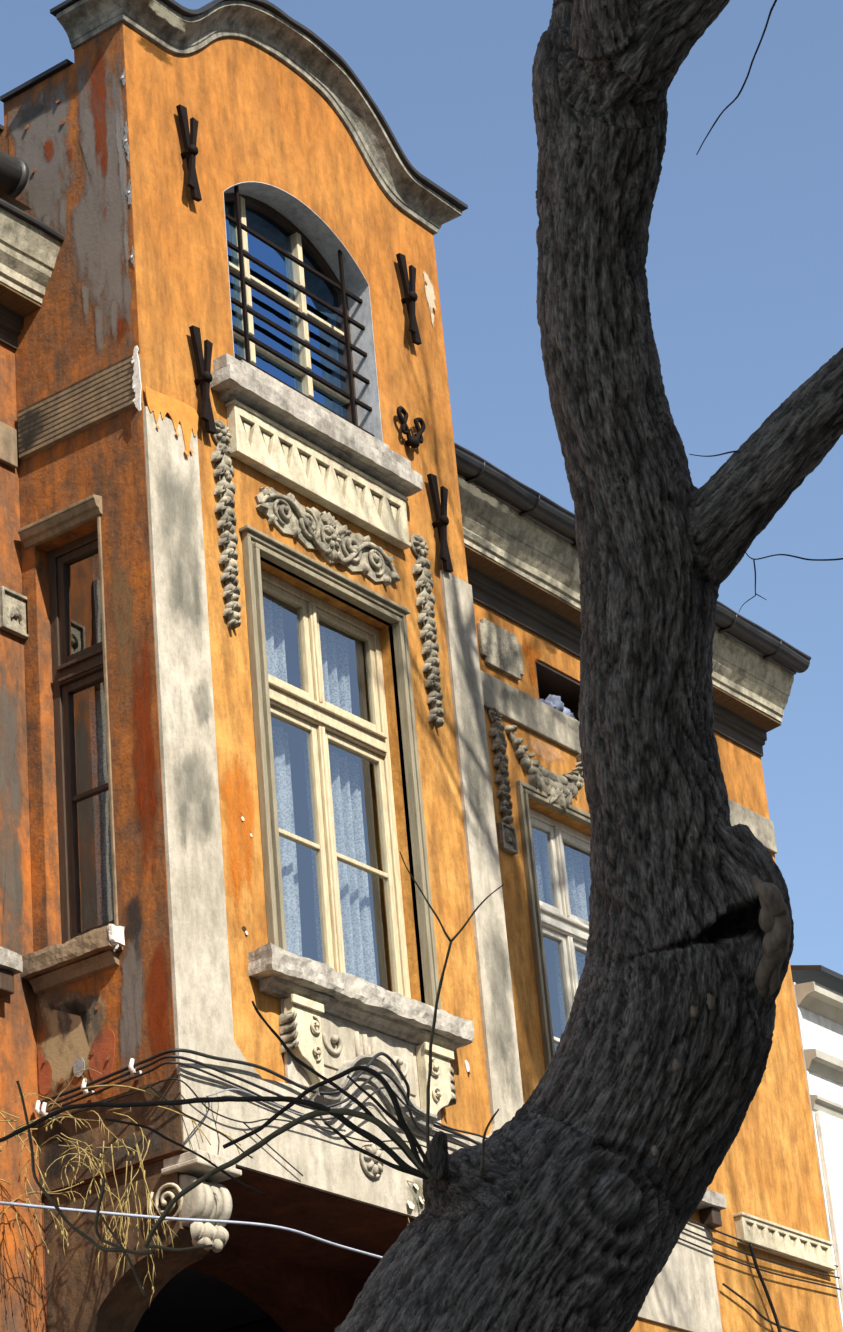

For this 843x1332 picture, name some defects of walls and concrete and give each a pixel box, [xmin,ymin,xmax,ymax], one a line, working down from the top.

peeling [423,272,436,324]
peeling [131,346,199,460]
peeling [40,993,110,1089]